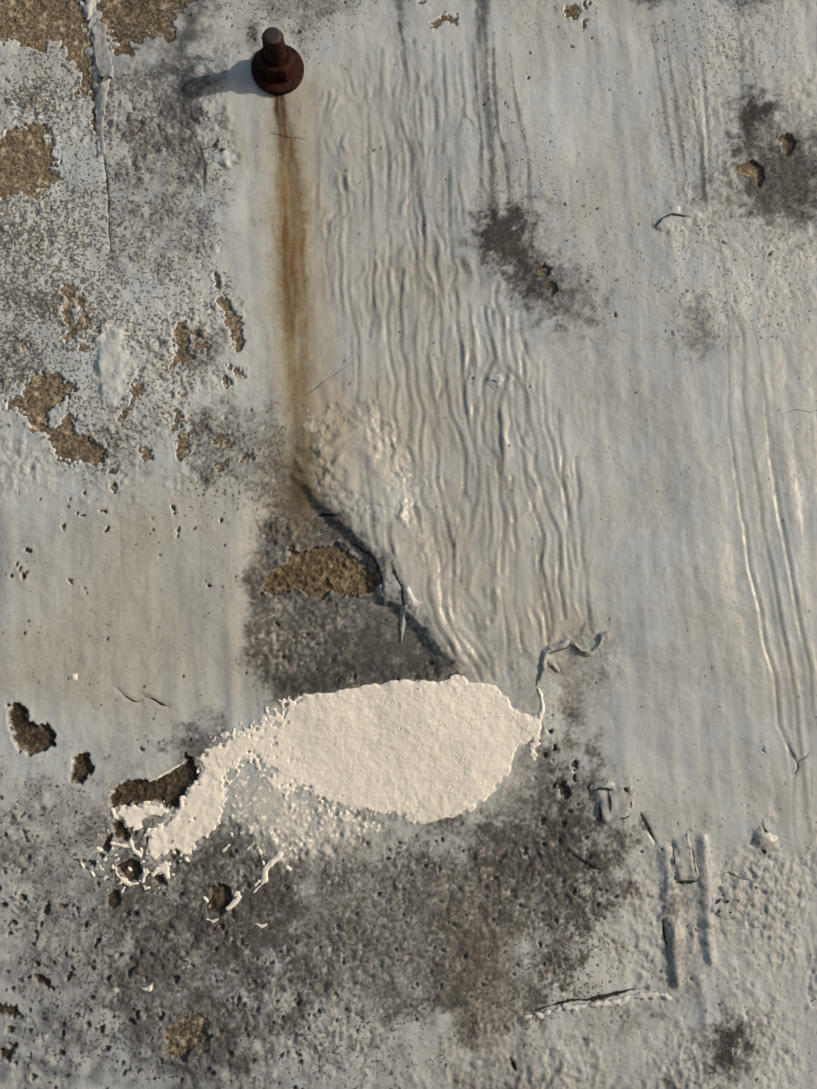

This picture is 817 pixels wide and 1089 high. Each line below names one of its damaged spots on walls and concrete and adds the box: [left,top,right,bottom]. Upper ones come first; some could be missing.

peeling [0,0,198,140]
crack [103,155,111,247]
rust [275,95,309,420]
water stain [473,0,575,312]
water stain [729,85,817,222]
peeling [4,371,118,493]
rust [285,442,317,525]
crack [351,543,404,606]
spalling [8,703,56,755]
spalling [111,755,200,808]
water stain [526,748,584,875]
crack [524,988,672,1019]